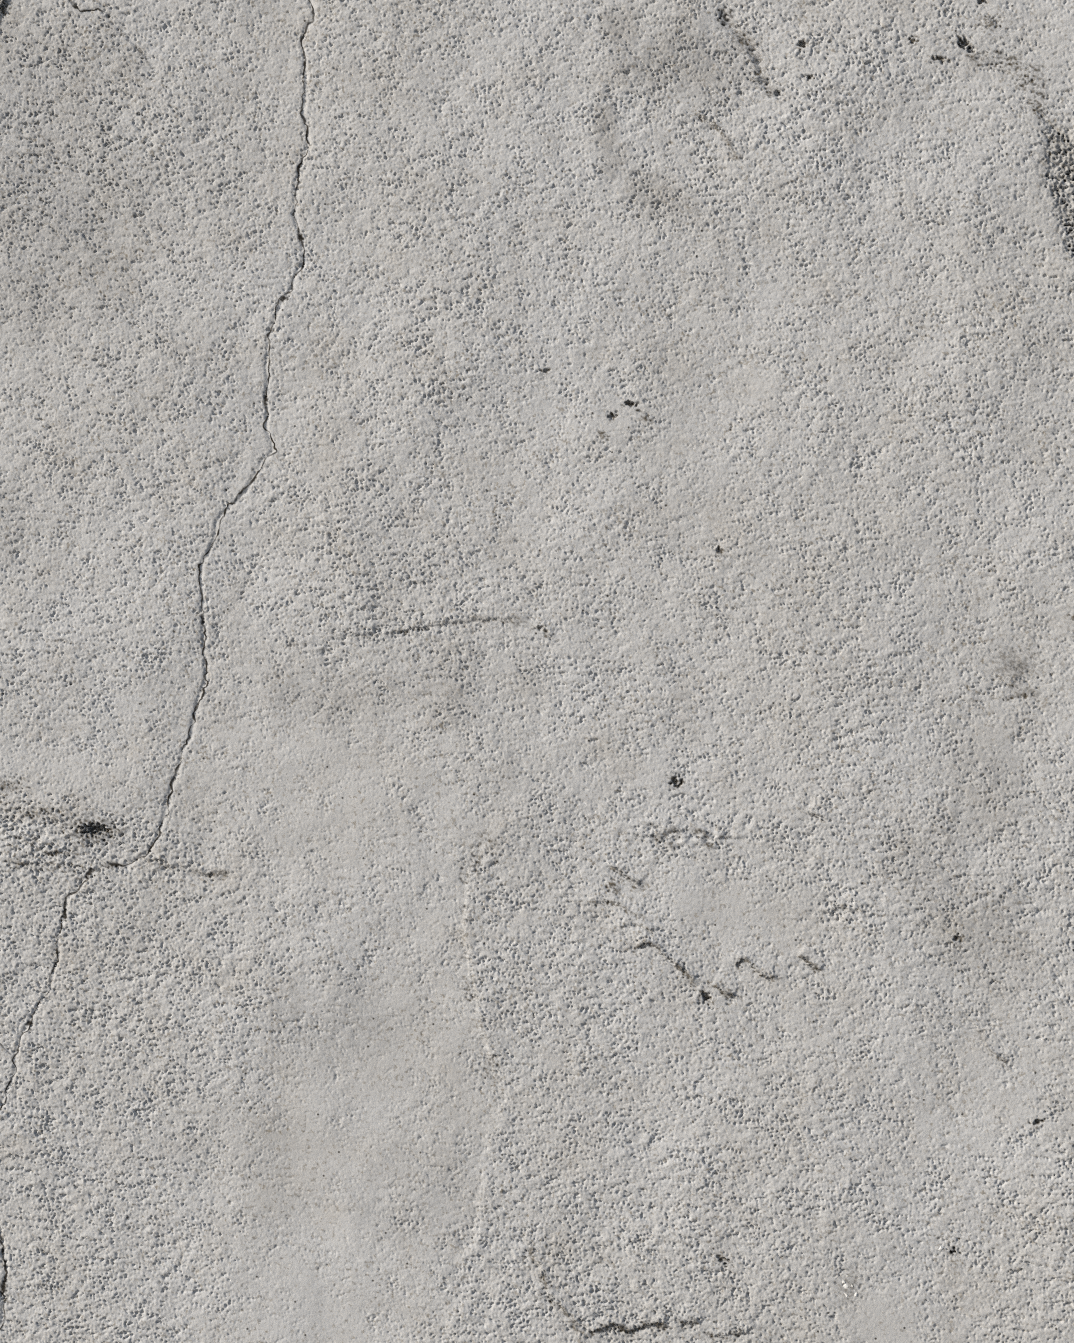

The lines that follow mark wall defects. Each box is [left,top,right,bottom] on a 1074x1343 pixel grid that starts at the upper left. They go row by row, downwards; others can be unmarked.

crack [0,0,314,1110]
crack [0,1235,8,1329]
crack [529,1249,771,1341]